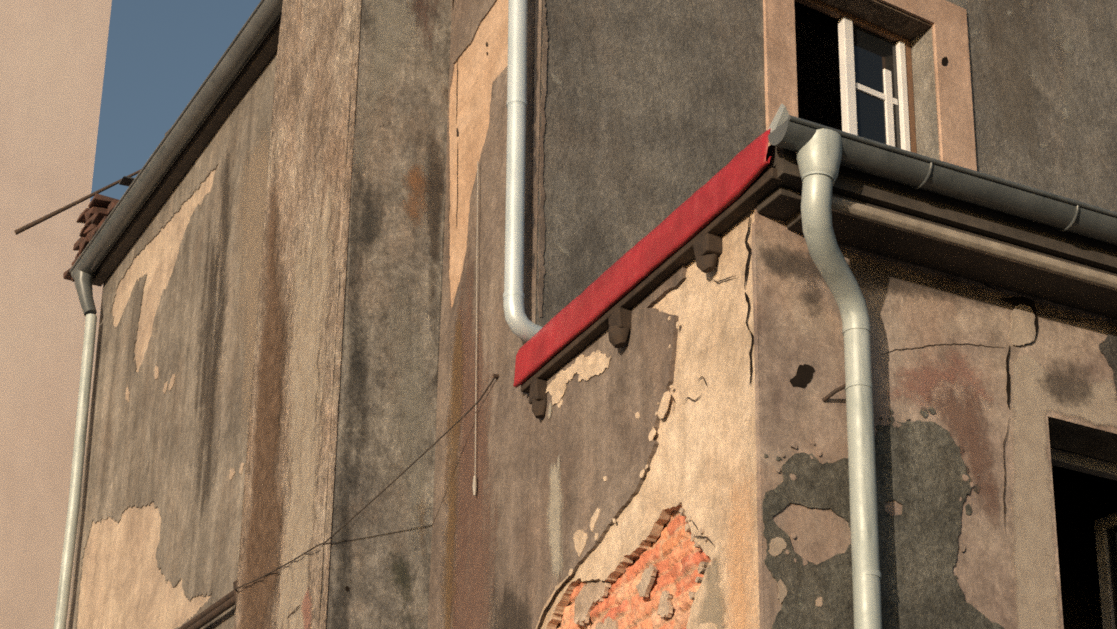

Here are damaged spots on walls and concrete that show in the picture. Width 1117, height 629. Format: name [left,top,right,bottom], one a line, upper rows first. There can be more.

peeling [449,0,508,309]
peeling [77,502,211,629]
peeling [112,166,218,394]
leakage [198,139,331,629]
peeling [535,206,854,629]
crack [713,216,754,383]
peeling [875,407,1004,629]
crack [881,343,1010,533]
crack [971,279,1095,336]
flaking render [1011,331,1117,629]